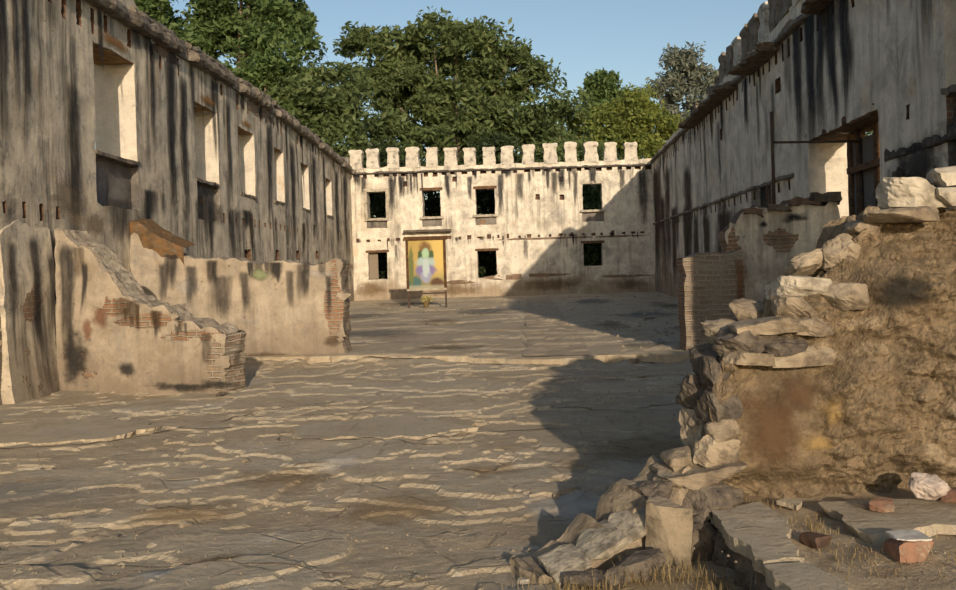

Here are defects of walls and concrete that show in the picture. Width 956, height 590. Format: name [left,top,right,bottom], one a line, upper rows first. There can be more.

damp [0,0,30,132]
damp [167,63,195,195]
damp [211,78,244,187]
damp [259,106,366,258]
damp [387,173,423,206]
damp [498,170,530,208]
damp [542,169,577,198]
damp [792,0,852,151]
crack [0,412,259,461]
spalling [93,291,230,394]
spalling [311,258,351,342]
crack [277,322,676,445]